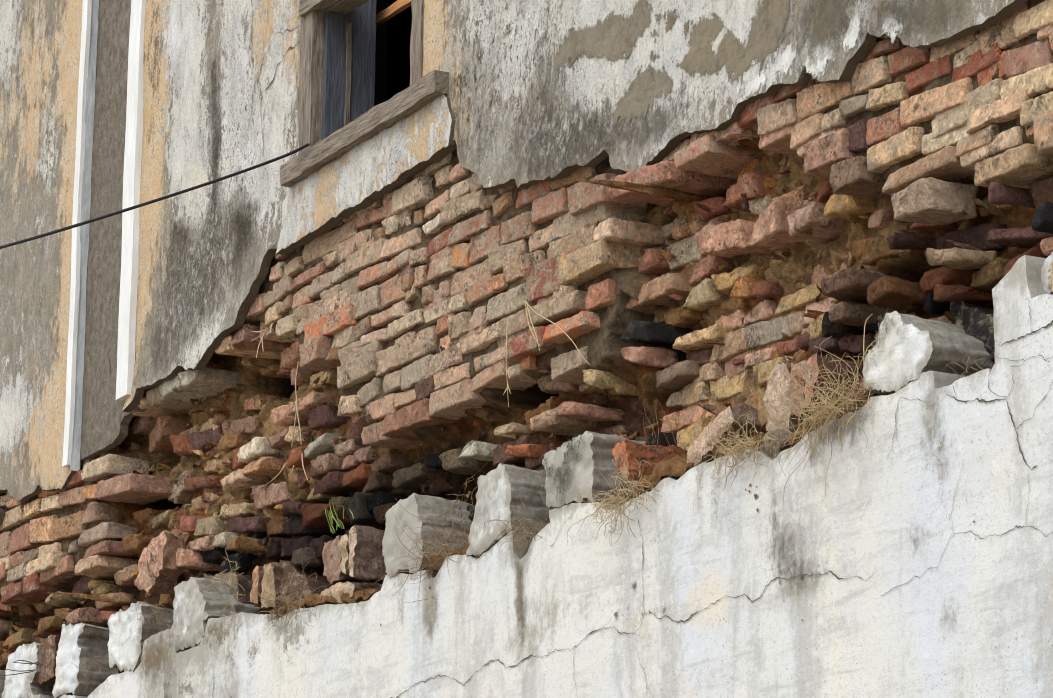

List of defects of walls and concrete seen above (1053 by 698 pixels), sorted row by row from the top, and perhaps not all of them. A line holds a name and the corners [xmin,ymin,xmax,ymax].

peeling [552,0,862,127]
spalling [878,0,962,43]
water stain [234,205,255,247]
spalling [560,135,1053,390]
spalling [694,403,731,416]
spalling [0,324,680,670]
crack [390,307,1053,698]
water stain [425,583,436,636]
water stain [512,528,526,635]